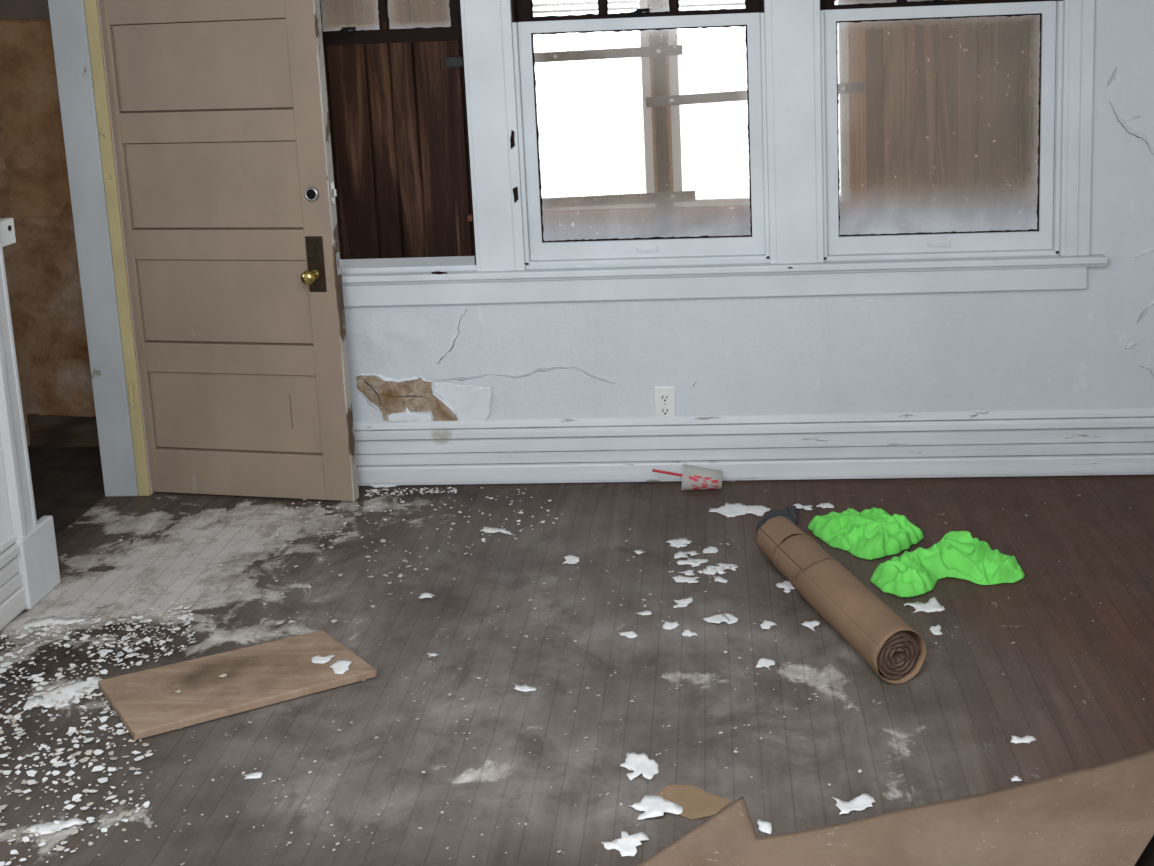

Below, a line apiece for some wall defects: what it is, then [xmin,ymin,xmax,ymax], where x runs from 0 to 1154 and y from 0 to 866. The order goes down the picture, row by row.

crack [1107,67,1154,154]
crack [434,309,615,384]
spalling [355,374,492,423]